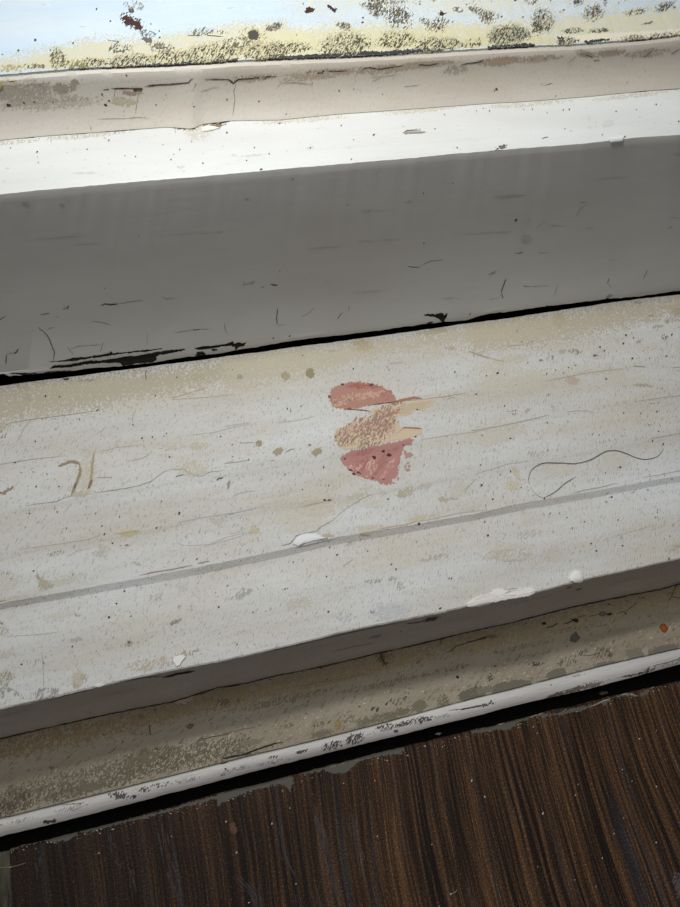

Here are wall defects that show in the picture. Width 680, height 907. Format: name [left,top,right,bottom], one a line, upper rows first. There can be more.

water stain [0,0,680,112]
crack [77,63,439,138]
peeling [0,341,247,375]
peeling [330,381,436,485]
spalling [321,722,365,752]
spalling [375,703,437,733]
spalling [0,747,405,856]